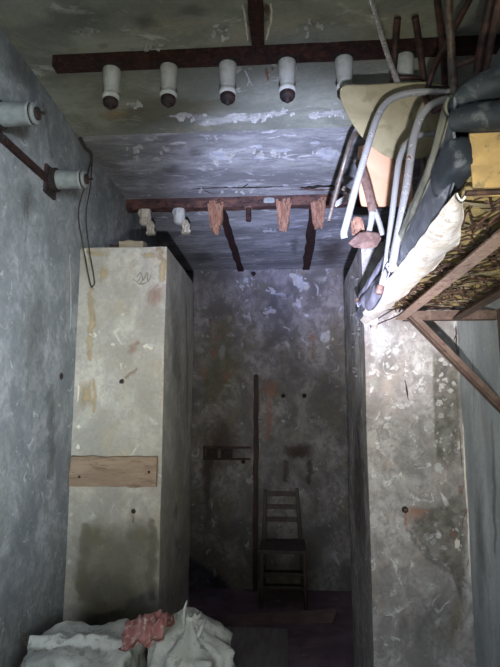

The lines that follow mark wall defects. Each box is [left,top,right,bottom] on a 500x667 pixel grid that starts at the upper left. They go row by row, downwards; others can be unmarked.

peeling [170,107,295,126]
peeling [207,149,237,166]
peeling [249,145,292,160]
peeling [370,319,425,380]
spalling [418,357,460,474]
damp [79,520,158,626]